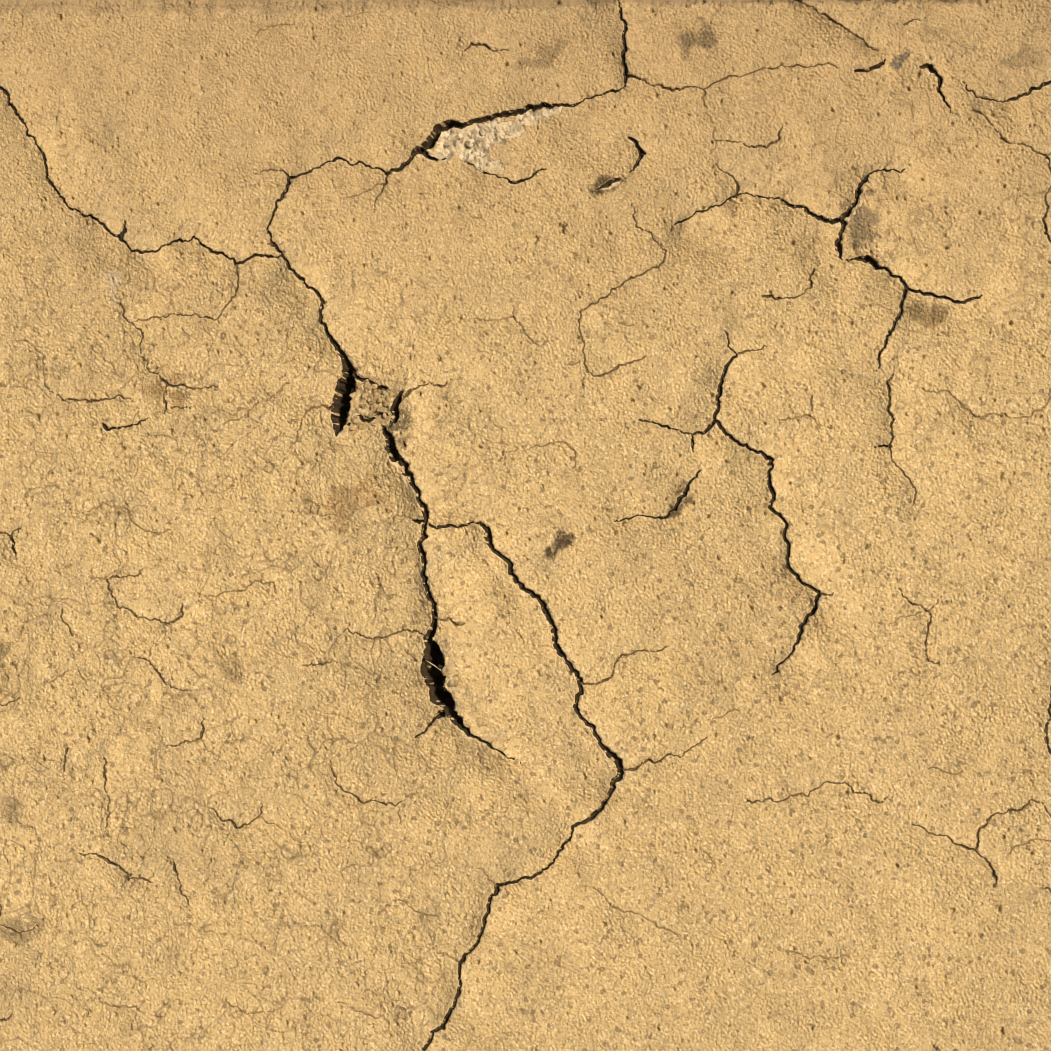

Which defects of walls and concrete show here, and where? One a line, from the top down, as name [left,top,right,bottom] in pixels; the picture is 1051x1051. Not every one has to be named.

crack [854,59,886,73]
spalling [430,106,562,172]
crack [919,63,1051,243]
crack [674,161,982,372]
crack [922,388,1051,419]
crack [871,373,917,519]
crack [0,0,838,1051]
crack [878,588,943,664]
crack [1043,686,1051,755]
crack [746,781,889,804]
crack [911,799,1051,888]
crack [789,950,849,960]